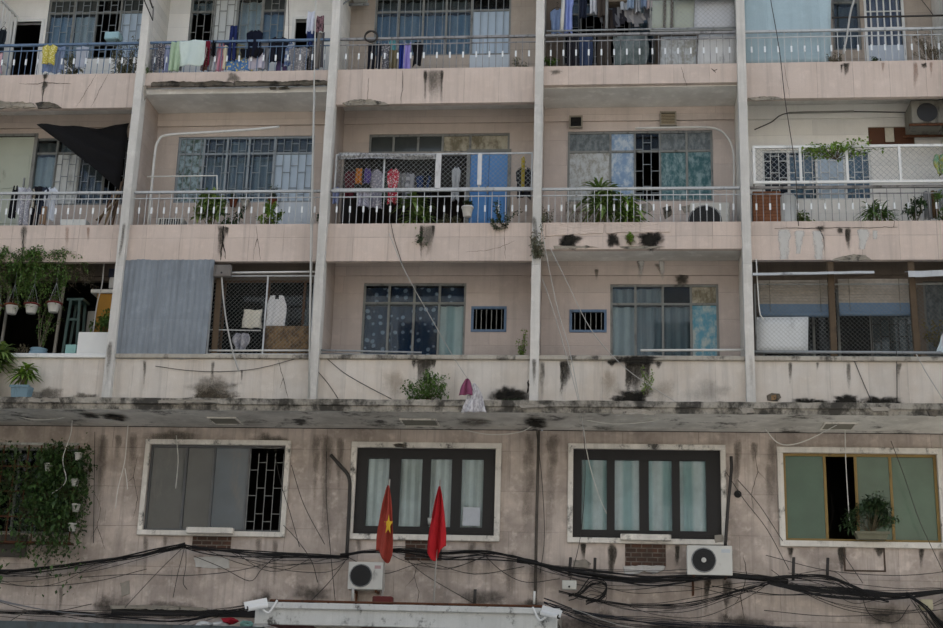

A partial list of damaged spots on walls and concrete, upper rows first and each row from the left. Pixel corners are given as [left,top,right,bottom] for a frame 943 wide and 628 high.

crack [39,75,108,106]
damp [218,227,229,245]
damp [559,234,582,249]
damp [607,233,619,247]
damp [638,232,664,250]
peeling [779,229,871,261]
damp [196,362,235,399]
damp [560,361,570,386]
damp [607,356,662,401]
damp [490,387,527,400]
damp [795,395,900,403]
damp [79,413,126,421]